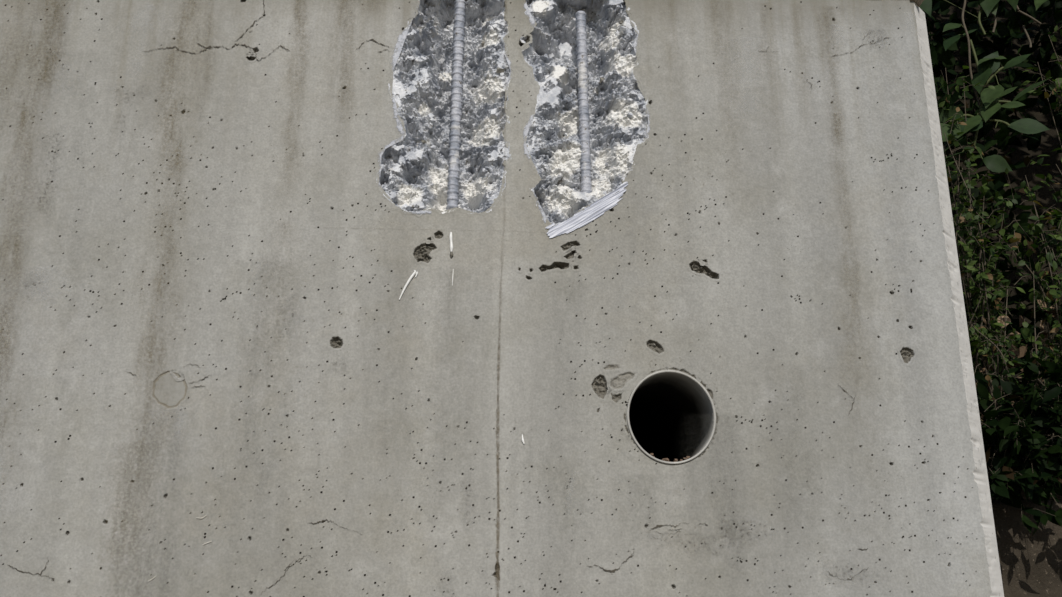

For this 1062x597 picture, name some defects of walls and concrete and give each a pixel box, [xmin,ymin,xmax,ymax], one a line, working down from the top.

crack [142,0,290,61]
spalling [375,0,651,238]